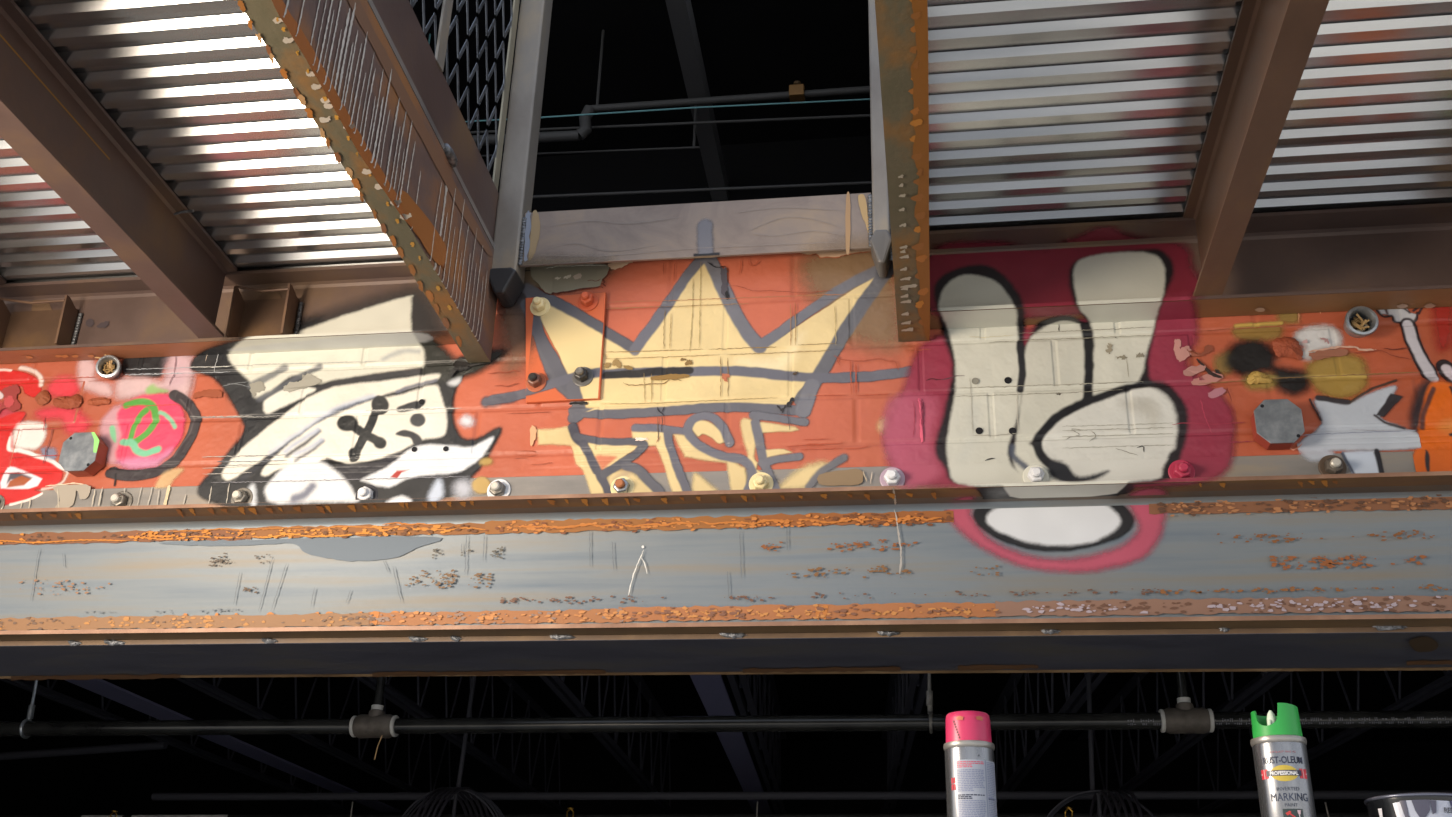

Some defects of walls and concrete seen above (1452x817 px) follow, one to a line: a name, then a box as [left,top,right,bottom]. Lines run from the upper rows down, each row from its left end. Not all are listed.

rust [238,0,462,347]
rust [908,0,930,341]
rust [0,493,1452,631]
rust [1149,480,1452,517]